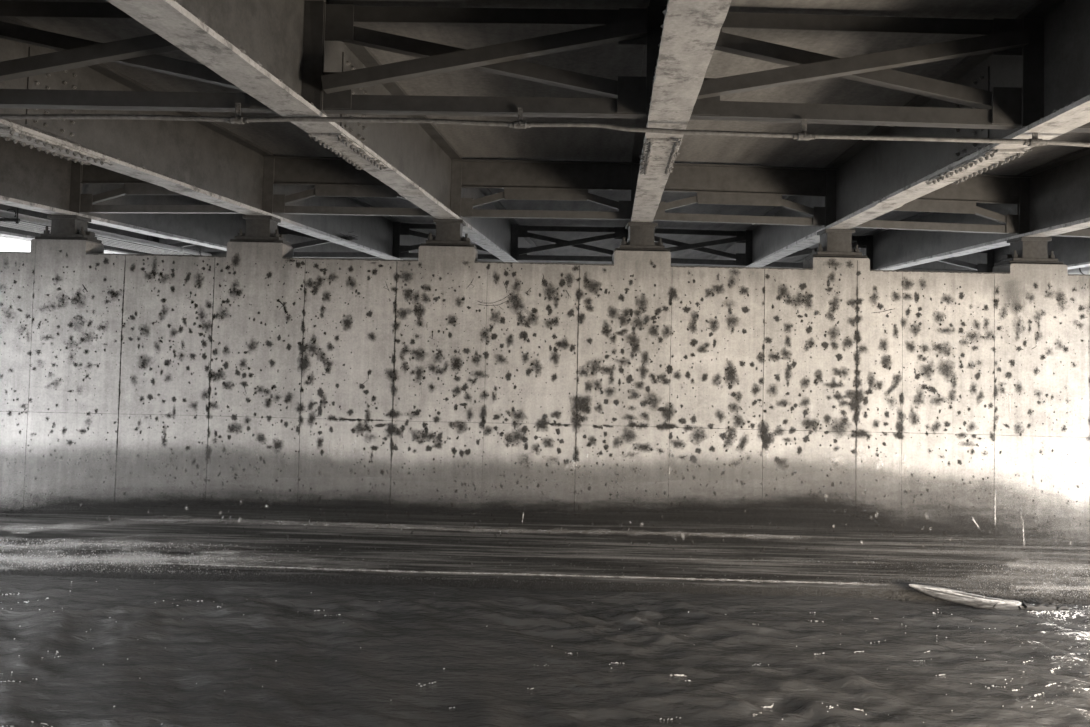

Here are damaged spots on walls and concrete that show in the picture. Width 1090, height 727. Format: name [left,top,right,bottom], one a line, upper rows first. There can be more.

water stain [0,250,1090,605]